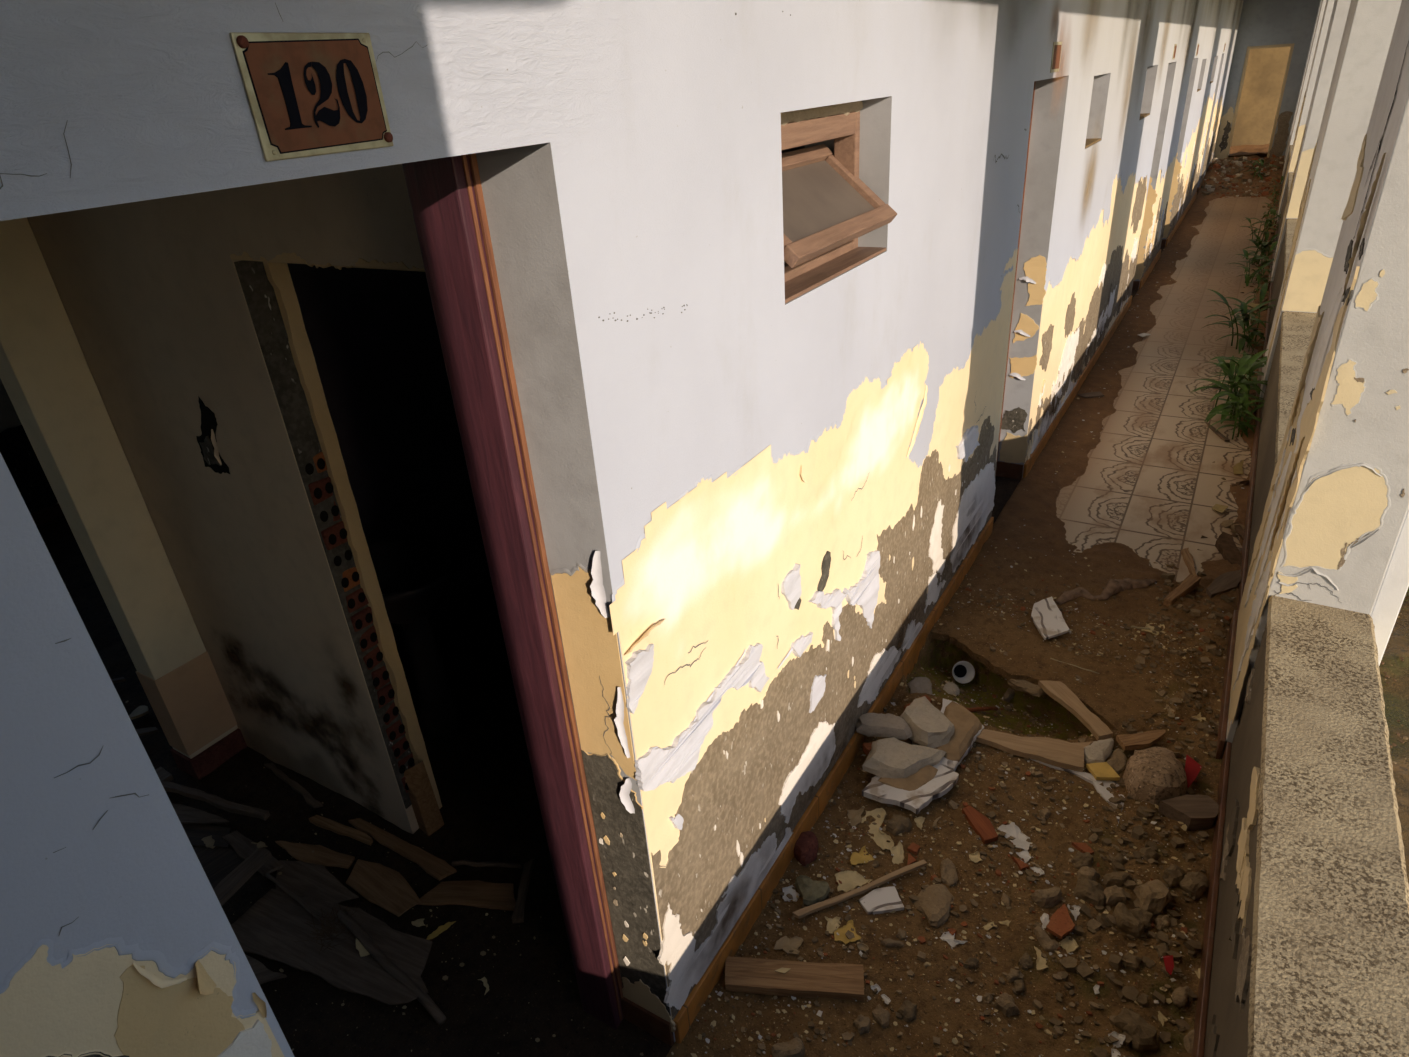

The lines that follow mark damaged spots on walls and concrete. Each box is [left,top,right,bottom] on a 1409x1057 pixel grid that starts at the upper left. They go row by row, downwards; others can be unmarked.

crack [0,120,72,189]
water stain [1084,162,1094,204]
peeling [1227,91,1405,734]
peeling [550,90,1234,1034]
water stain [225,642,370,789]
peeling [1209,767,1261,1013]
peeling [0,937,284,1057]